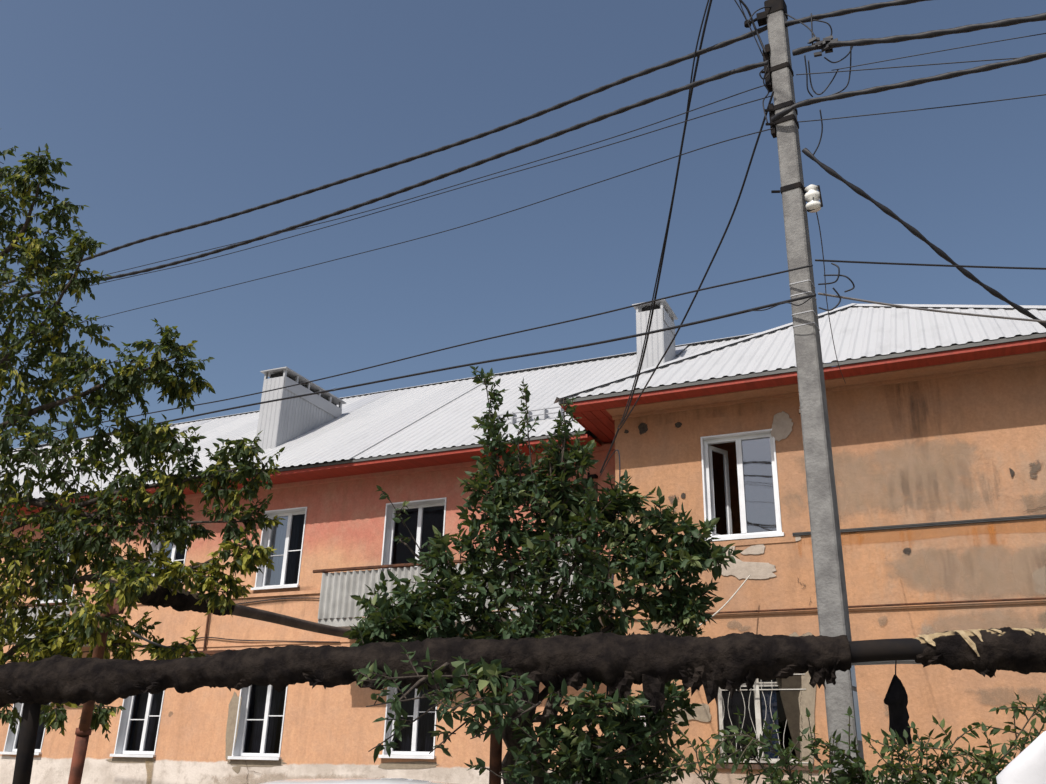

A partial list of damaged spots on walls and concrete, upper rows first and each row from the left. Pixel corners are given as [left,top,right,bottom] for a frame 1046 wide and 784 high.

flaking render [712,544,776,580]